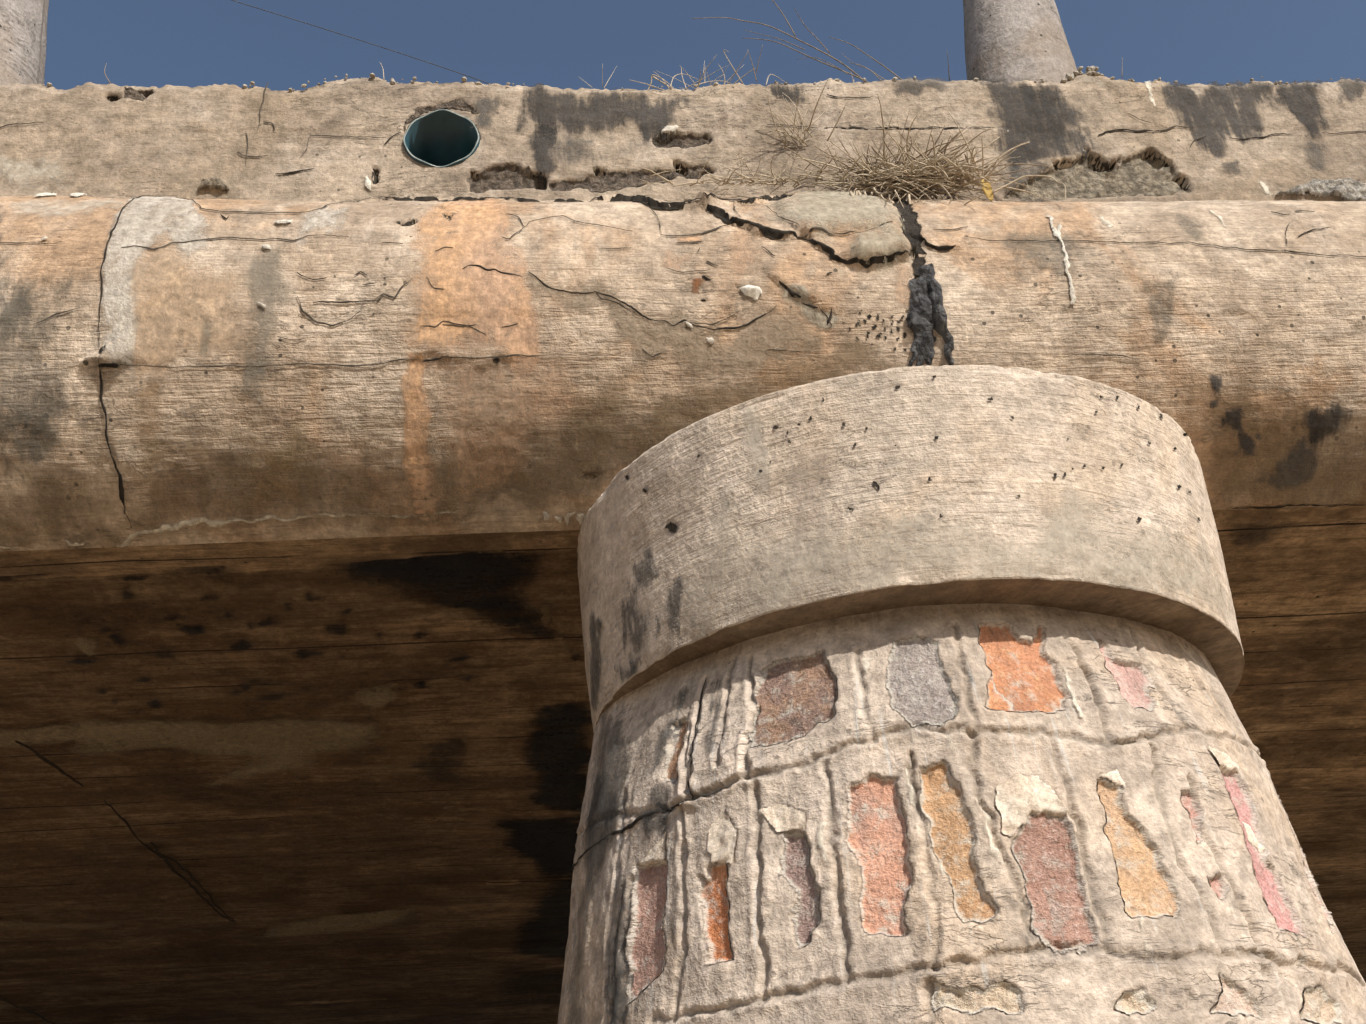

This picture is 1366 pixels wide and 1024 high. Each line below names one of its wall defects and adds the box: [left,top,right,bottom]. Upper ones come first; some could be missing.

water stain [517,83,689,187]
water stain [982,78,1092,202]
water stain [1145,80,1328,173]
corrosion [393,199,540,520]
crack [35,191,1366,528]
water stain [1210,375,1260,456]
crack [571,679,732,873]
peeling [697,808,736,965]
peeling [749,651,838,747]
peeling [919,760,998,923]
peeling [978,622,1069,713]
peeling [995,773,1100,955]